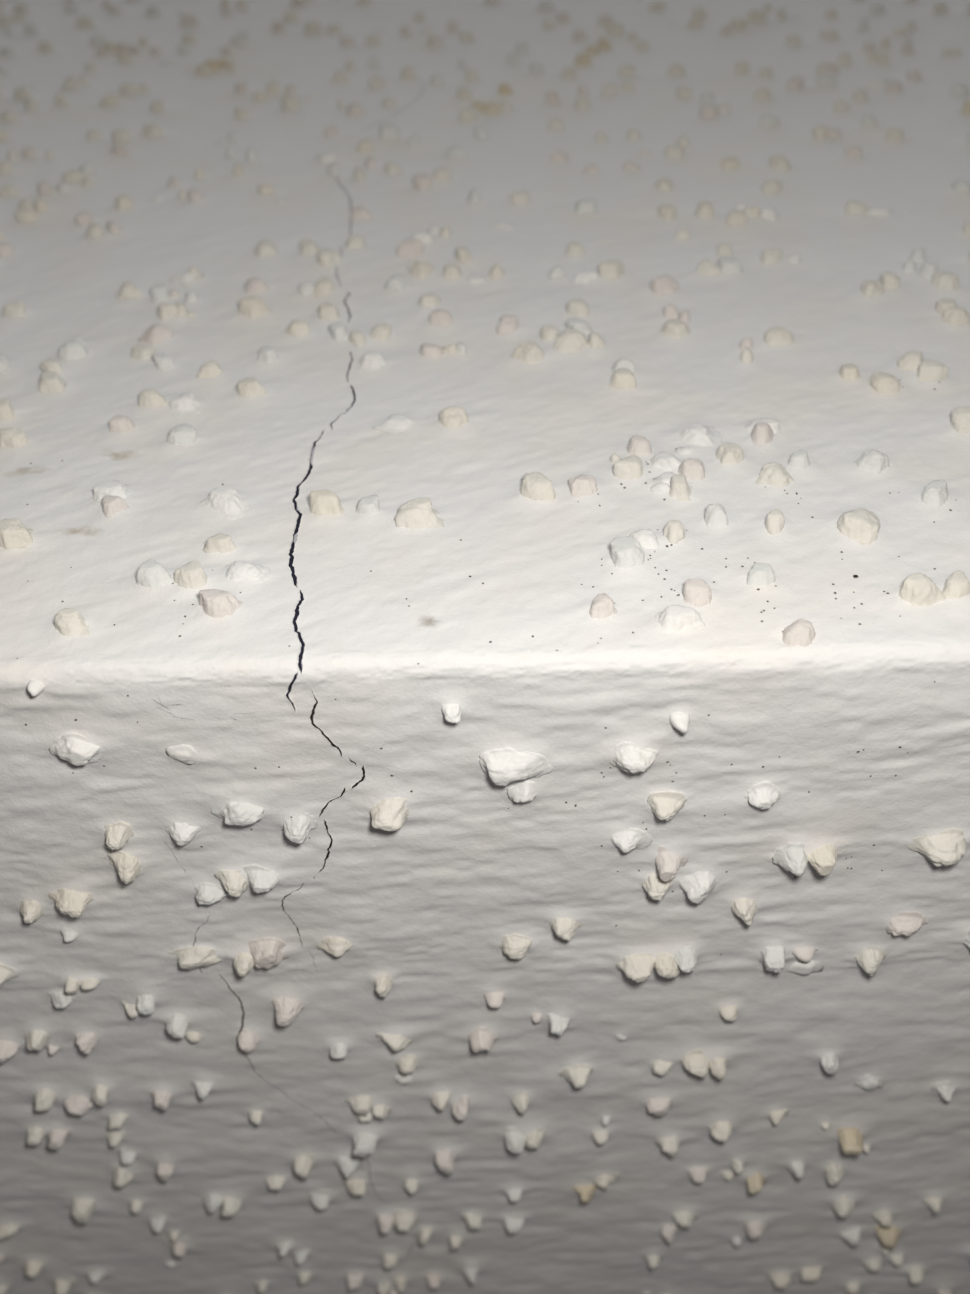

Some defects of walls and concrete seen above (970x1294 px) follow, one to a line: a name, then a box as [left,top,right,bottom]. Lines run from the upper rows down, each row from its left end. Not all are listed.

crack [281,176,367,967]
crack [193,916,338,1134]